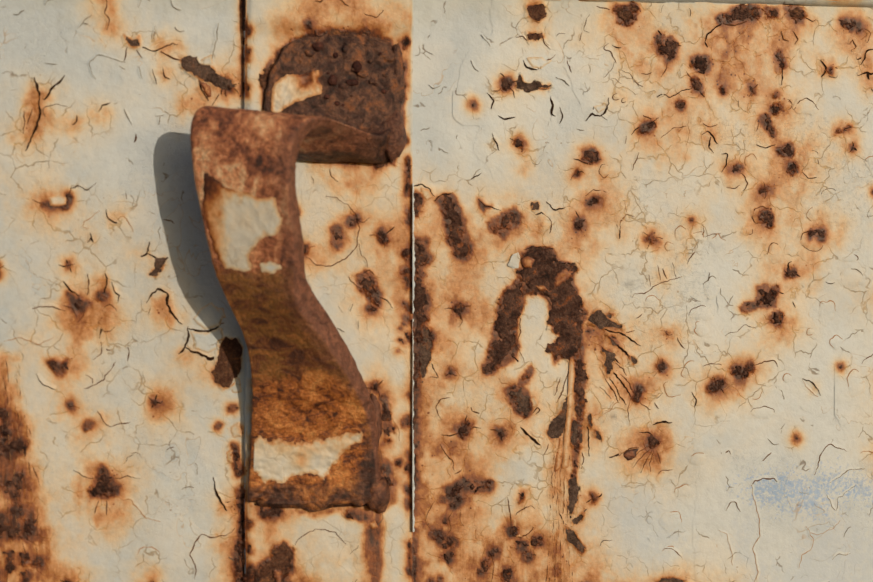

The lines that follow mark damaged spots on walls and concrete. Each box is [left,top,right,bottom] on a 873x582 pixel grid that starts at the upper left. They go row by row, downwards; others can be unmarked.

crack [137,0,183,39]
crack [0,47,143,151]
crack [471,91,542,179]
crack [523,5,754,179]
crack [1,301,63,345]
crack [59,193,216,361]
rust [245,0,873,582]
crack [547,200,716,318]
crack [501,425,549,455]
crack [629,392,684,460]
crack [183,463,244,573]
crack [629,545,695,582]